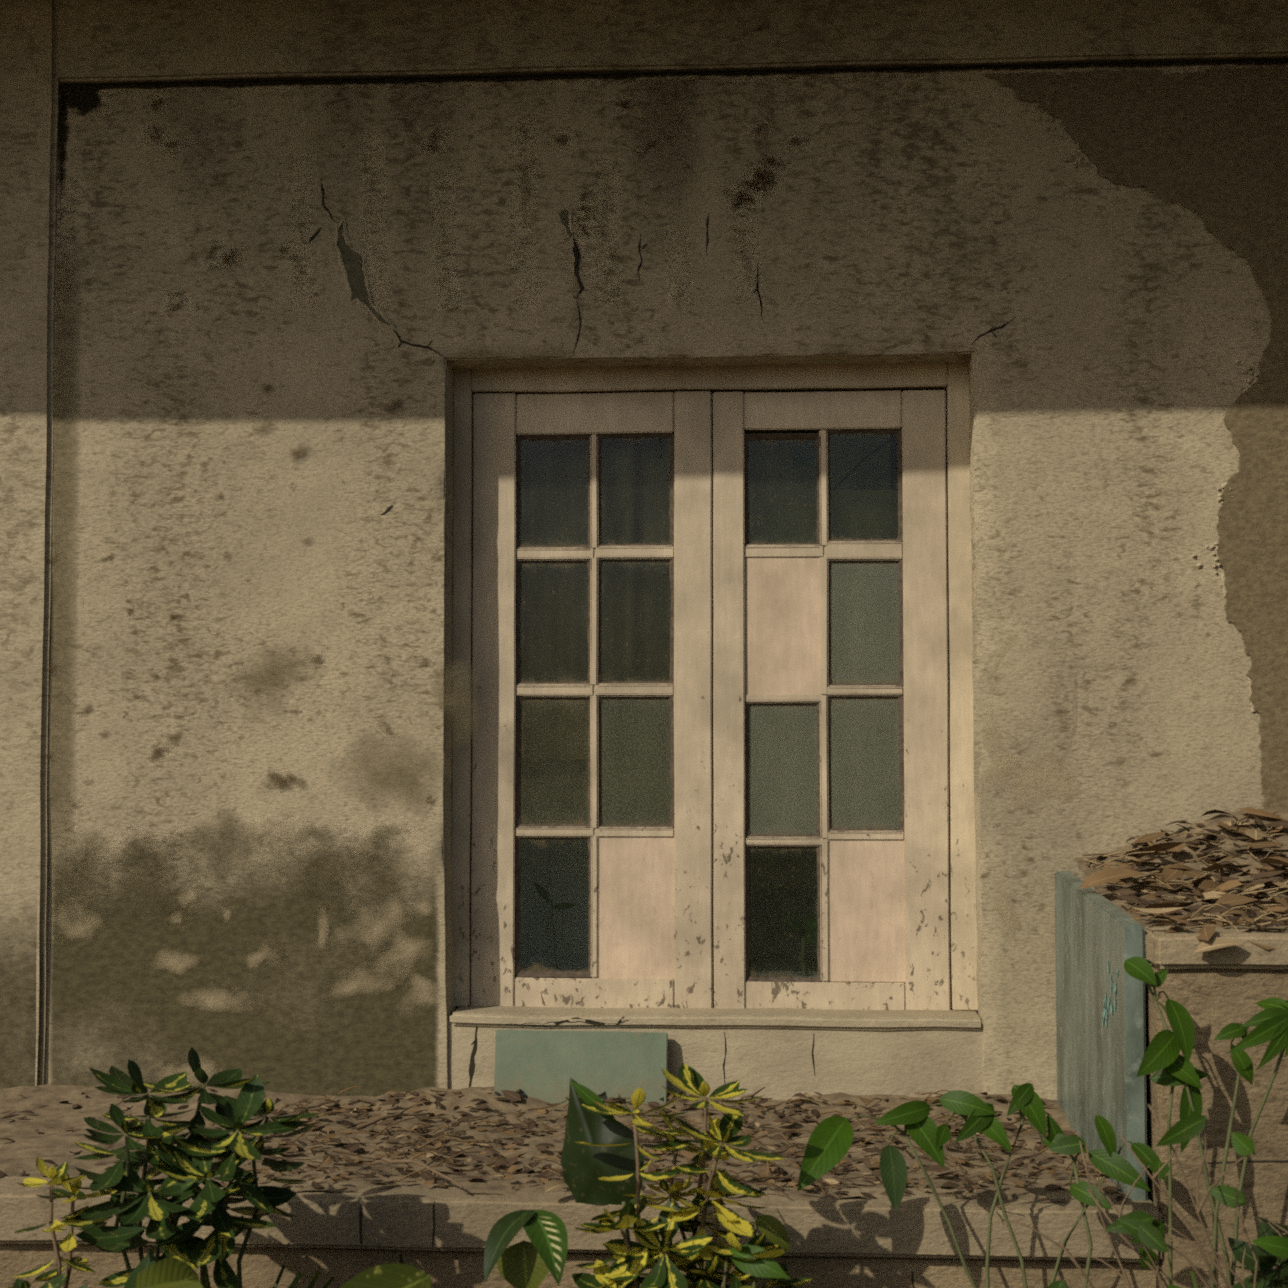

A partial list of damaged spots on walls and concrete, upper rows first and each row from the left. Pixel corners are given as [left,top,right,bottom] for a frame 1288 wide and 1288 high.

crack [308,177,338,243]
crack [572,238,586,354]
crack [393,330,445,358]